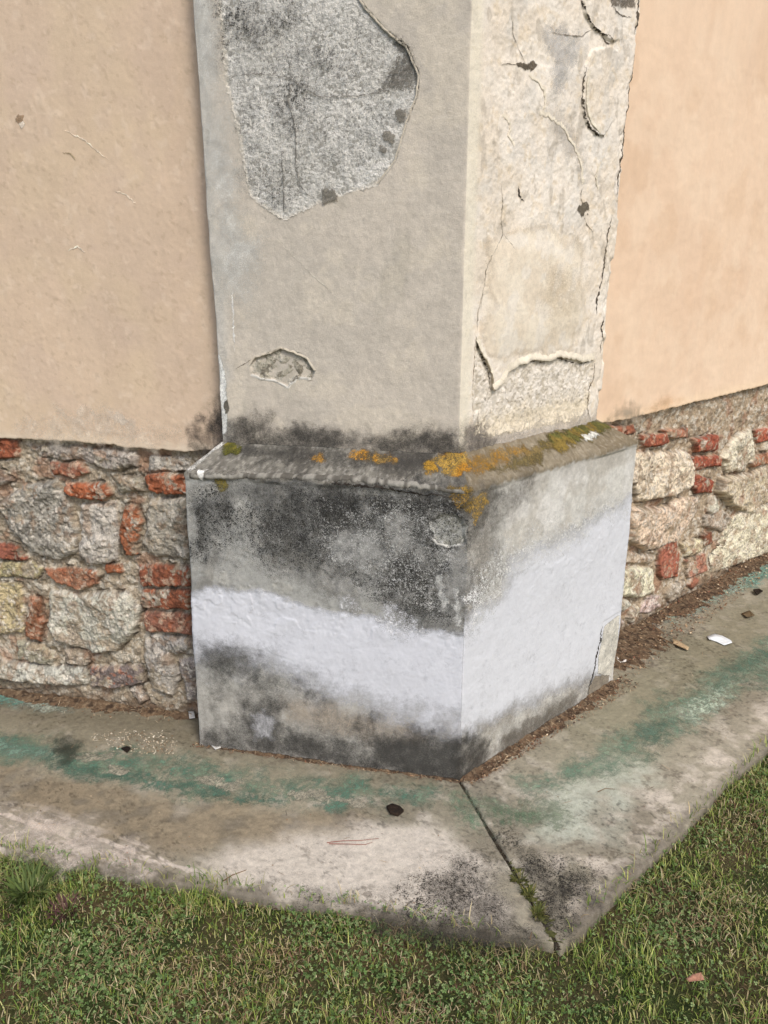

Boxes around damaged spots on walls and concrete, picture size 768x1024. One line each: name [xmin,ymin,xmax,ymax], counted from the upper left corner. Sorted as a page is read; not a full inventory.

flaking render [213,0,420,220]
crack [553,0,640,349]
crack [477,184,524,329]
spalling [187,346,466,498]
peeling [472,336,595,438]
leakage [188,395,685,635]
crack [588,616,620,695]
leakage [206,685,588,786]